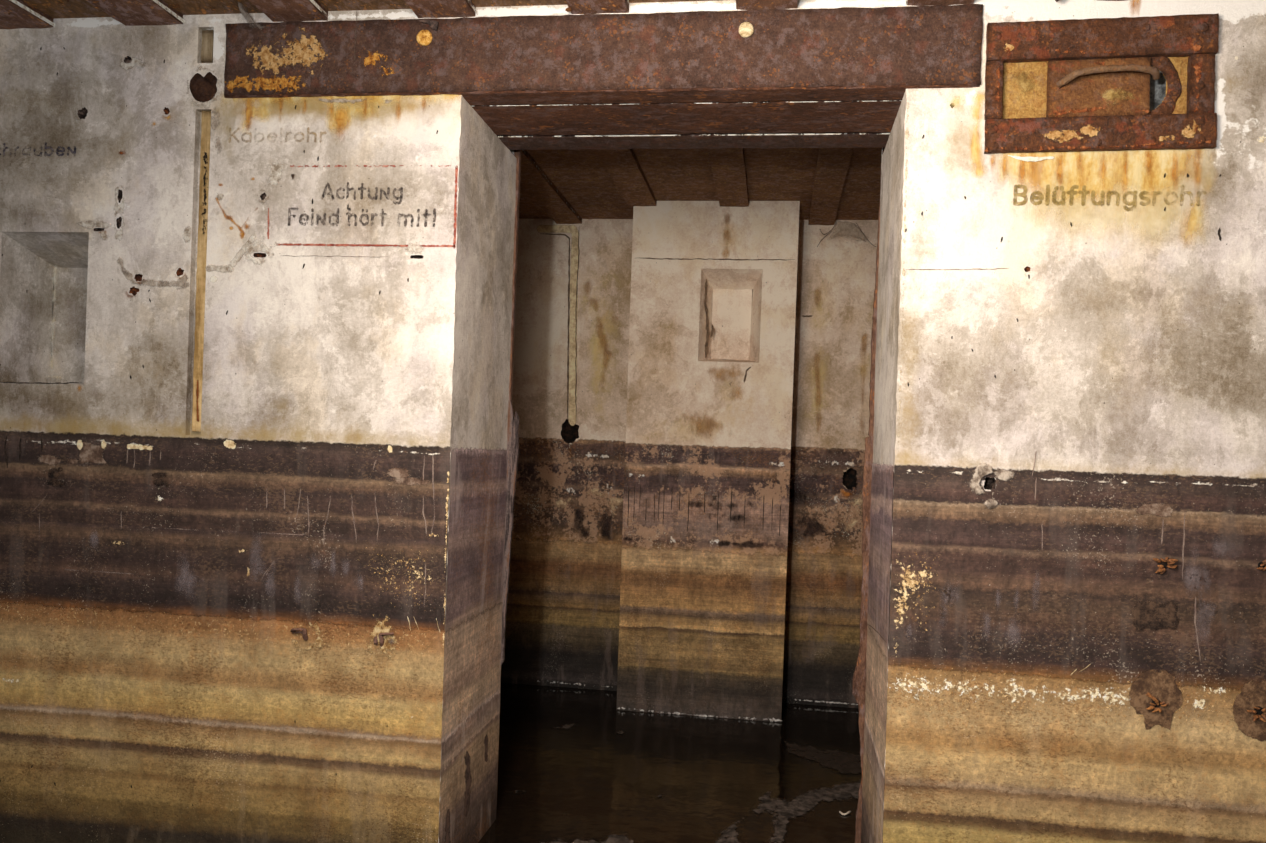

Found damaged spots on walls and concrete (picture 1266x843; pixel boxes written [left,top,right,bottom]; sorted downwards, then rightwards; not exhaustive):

spalling [190,67,221,150]
rust [235,97,306,126]
rust [325,94,457,128]
rust [971,95,1200,227]
spalling [970,464,1014,509]
spalling [367,618,397,659]
damp [0,420,1266,843]